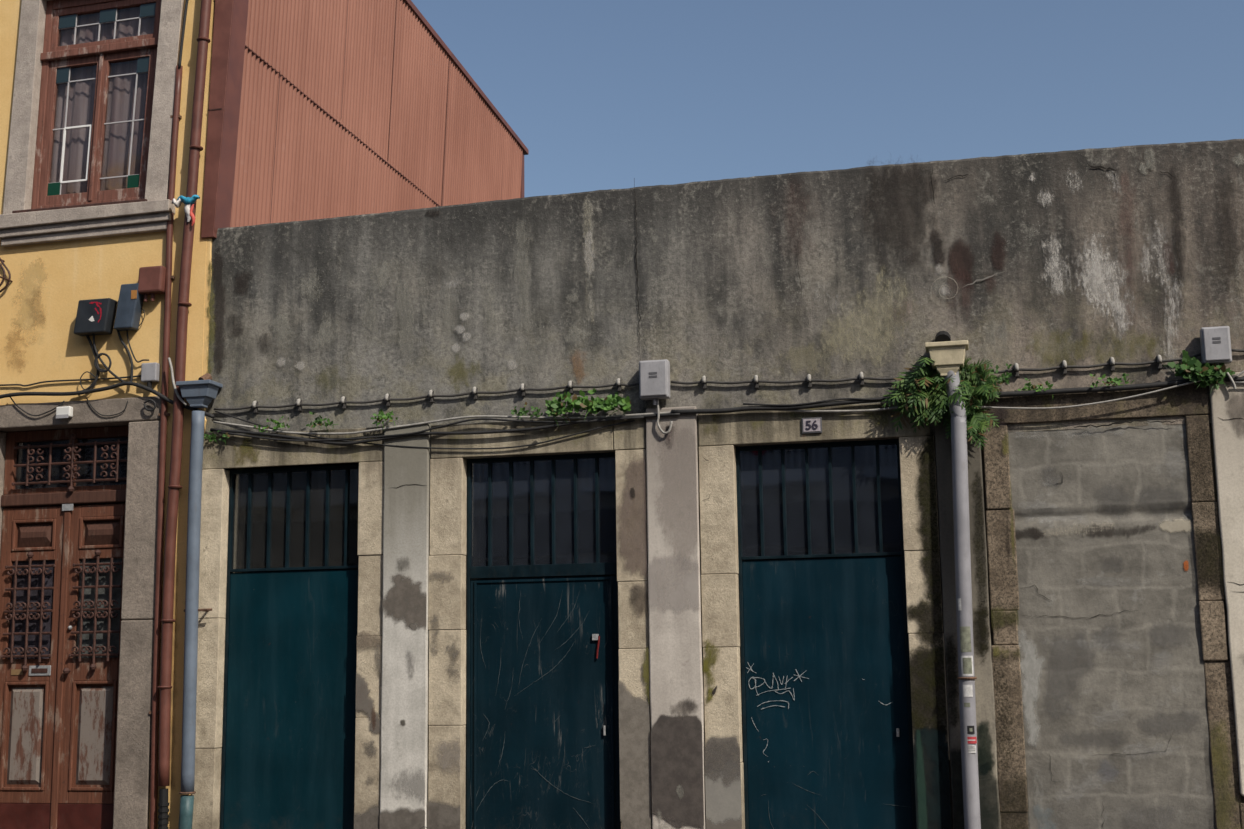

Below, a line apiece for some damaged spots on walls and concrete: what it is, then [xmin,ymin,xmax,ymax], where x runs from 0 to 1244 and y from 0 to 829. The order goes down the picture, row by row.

water stain [864,168,974,304]
water stain [992,231,1005,270]
water stain [1171,177,1183,312]
water stain [916,432,941,605]
peeling [382,572,460,677]
peeling [618,680,742,829]